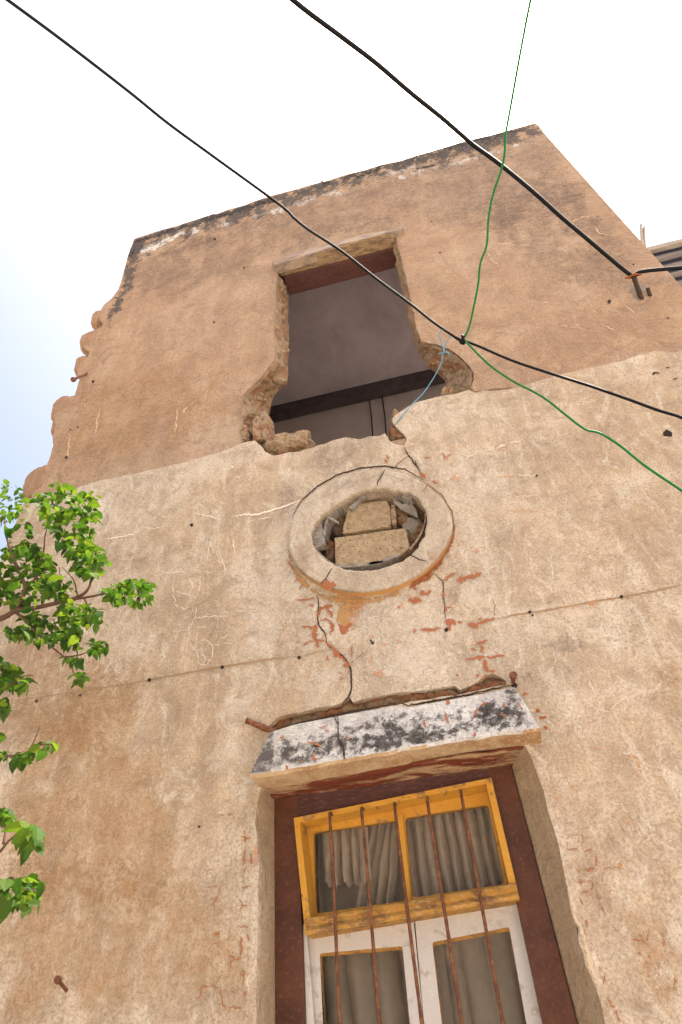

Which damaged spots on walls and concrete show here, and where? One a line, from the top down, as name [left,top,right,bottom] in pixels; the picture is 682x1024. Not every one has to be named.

leakage [107,125,542,329]
spalling [238,274,316,455]
crack [292,447,471,550]
spalling [388,409,404,441]
spalling [393,241,472,396]
peeling [364,442,516,502]
crack [9,543,511,759]
corrosion [289,525,455,629]
peeling [246,518,502,677]
mould [250,689,530,773]